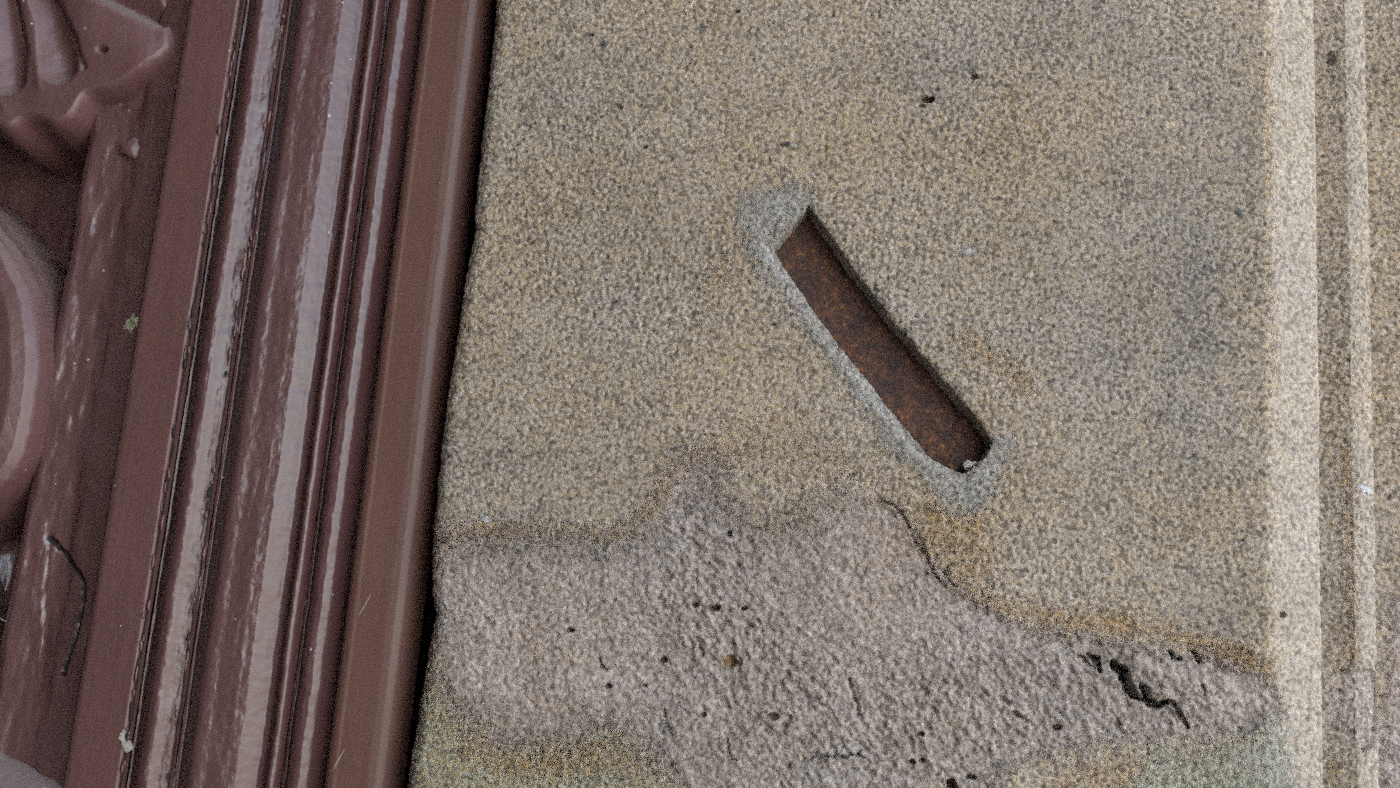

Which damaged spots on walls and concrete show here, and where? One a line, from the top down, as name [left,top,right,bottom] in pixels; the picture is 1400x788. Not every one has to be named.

spalling [431,445,1285,788]
crack [1086,652,1185,723]